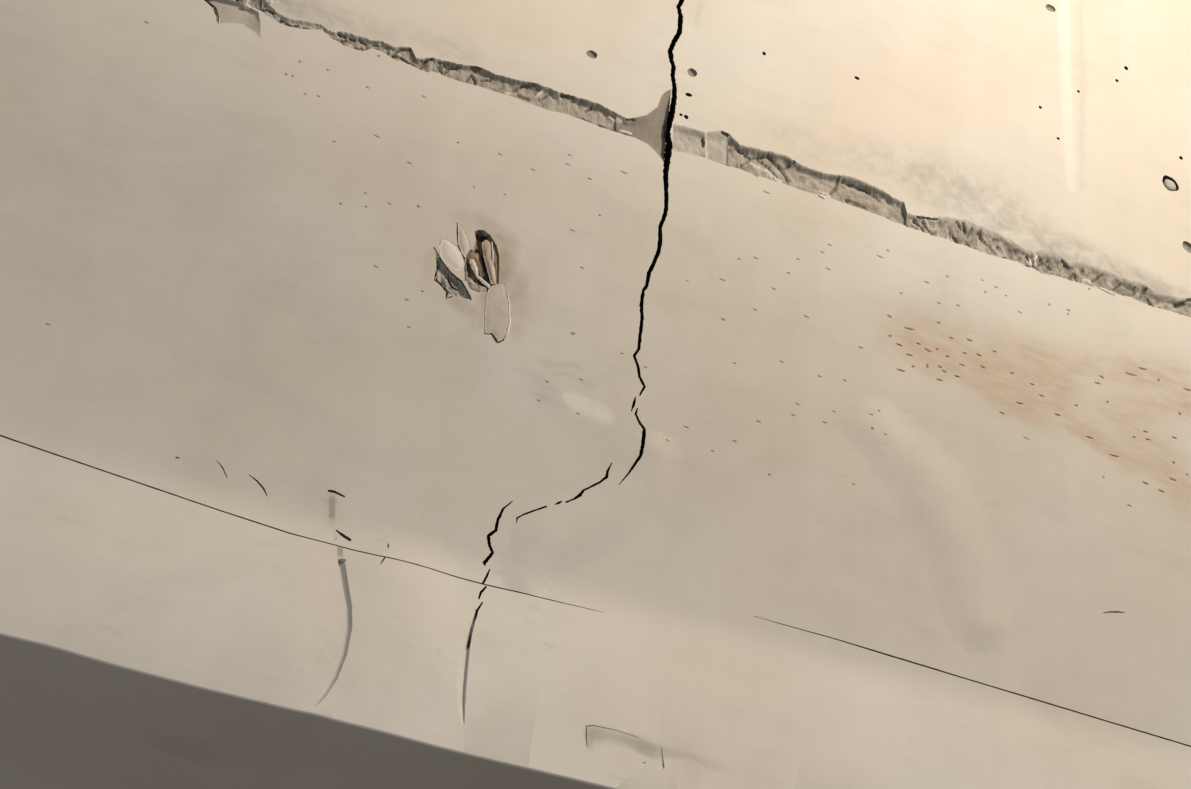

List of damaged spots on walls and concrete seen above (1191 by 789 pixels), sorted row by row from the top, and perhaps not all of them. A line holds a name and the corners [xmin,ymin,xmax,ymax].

spalling [204,0,273,39]
spalling [616,89,671,162]
spalling [409,196,568,355]
crack [0,0,684,724]
corrosion [833,267,1191,552]